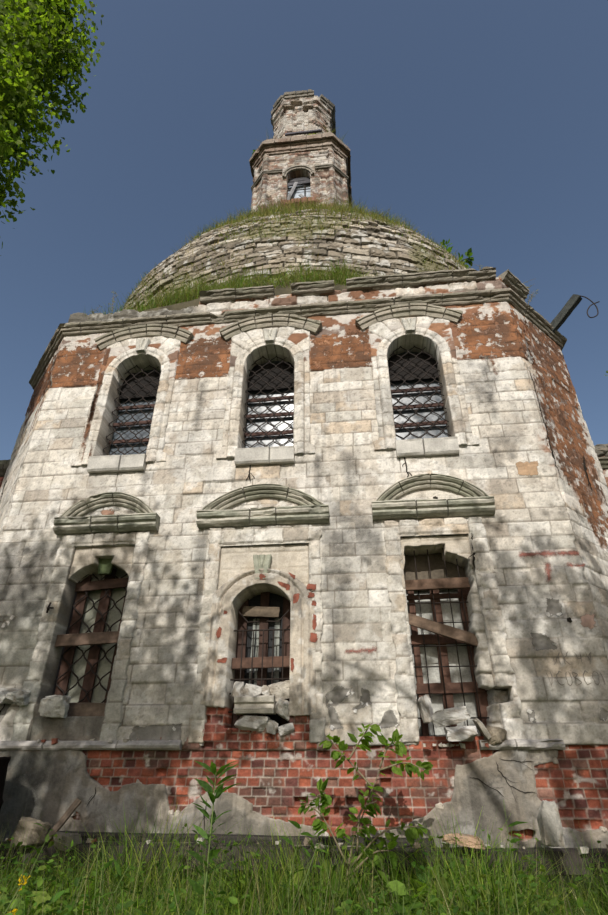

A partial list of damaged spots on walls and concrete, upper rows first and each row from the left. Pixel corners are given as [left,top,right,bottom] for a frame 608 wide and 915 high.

spalling [516,461,538,476]
peeling [326,686,372,730]
flaking render [82,706,499,837]
crack [470,758,537,803]
flaking render [534,745,608,832]
flaking render [508,829,533,845]